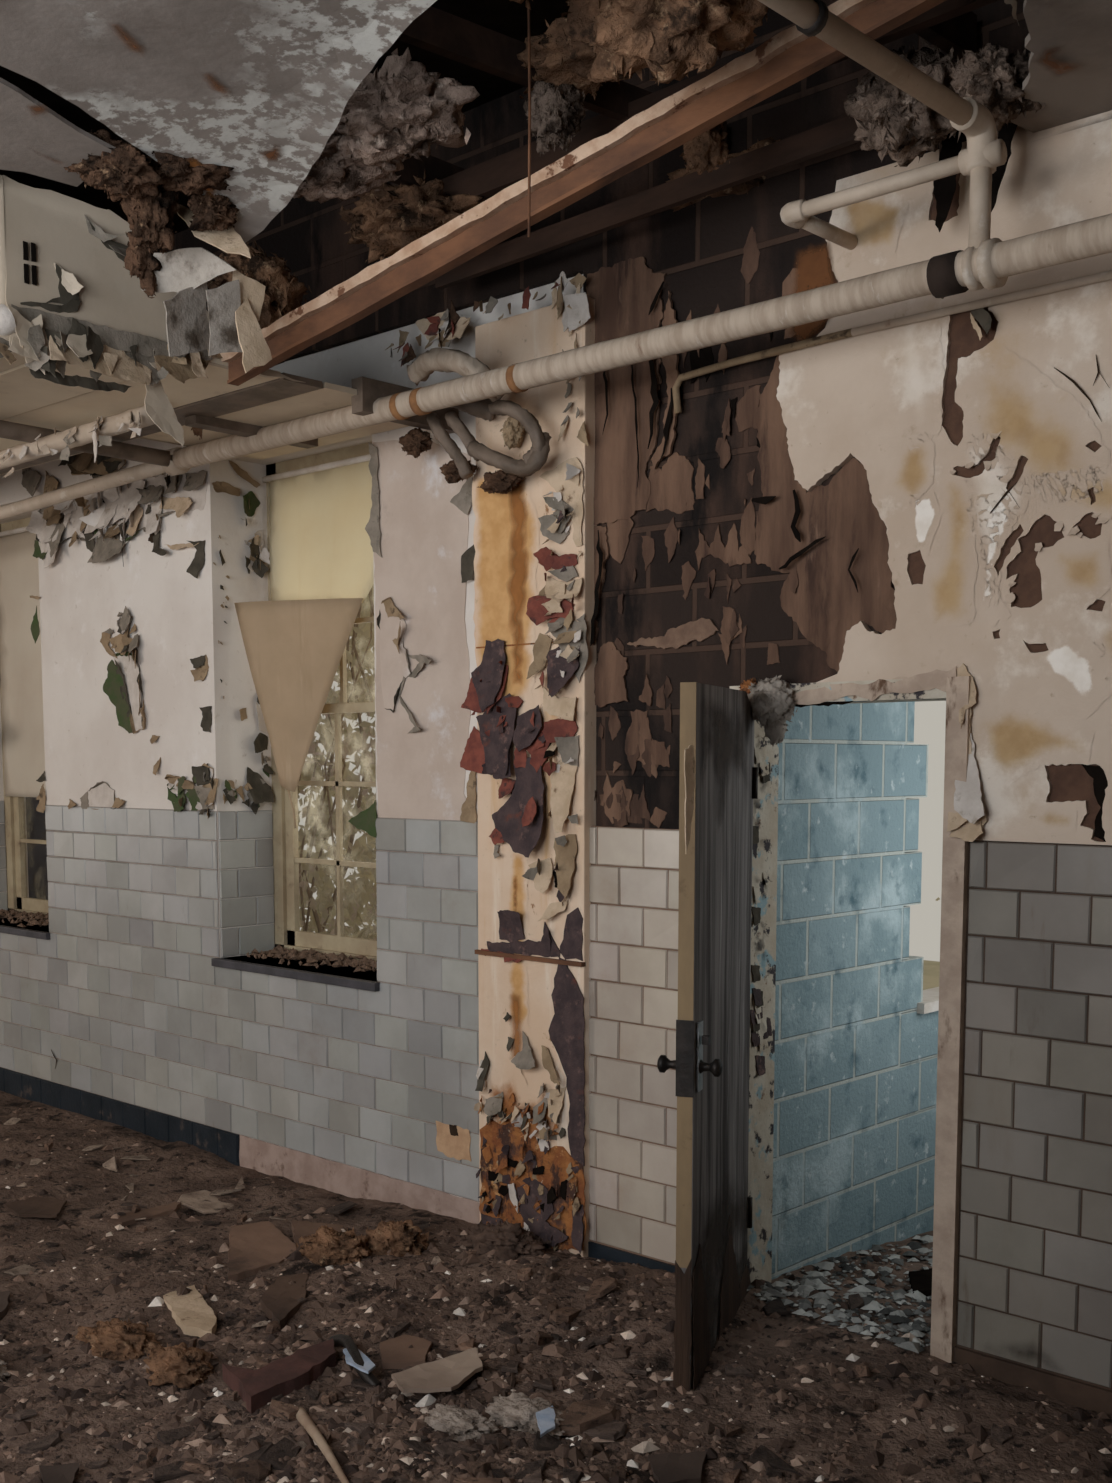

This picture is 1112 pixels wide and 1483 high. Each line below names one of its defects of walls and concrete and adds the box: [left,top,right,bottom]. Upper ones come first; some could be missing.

flaking render [385,184,838,366]
peeling [0,263,270,624]
peeling [30,595,41,643]
peeling [100,606,274,818]
corrosion [472,468,540,703]
flaking render [349,320,987,963]
flaking render [1026,643,1048,653]
flaking render [996,489,1109,608]
flaking render [1046,764,1108,842]
peeling [474,1012,566,1143]
corrosion [476,848,587,1254]
peeling [750,873,772,1076]